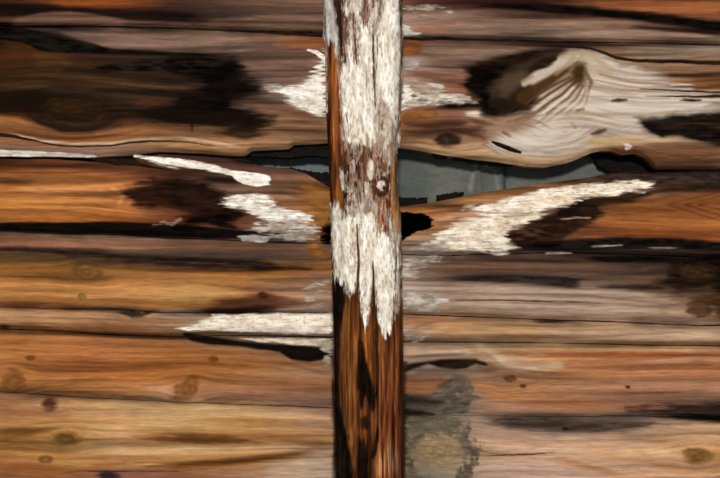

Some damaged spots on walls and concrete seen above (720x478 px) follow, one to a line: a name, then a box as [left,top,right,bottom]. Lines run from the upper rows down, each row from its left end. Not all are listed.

damp [0,26,273,138]
crack [491,141,522,154]
damp [0,178,285,239]
damp [455,275,581,288]
damp [505,173,720,315]
damp [184,277,379,478]
damp [403,359,487,478]